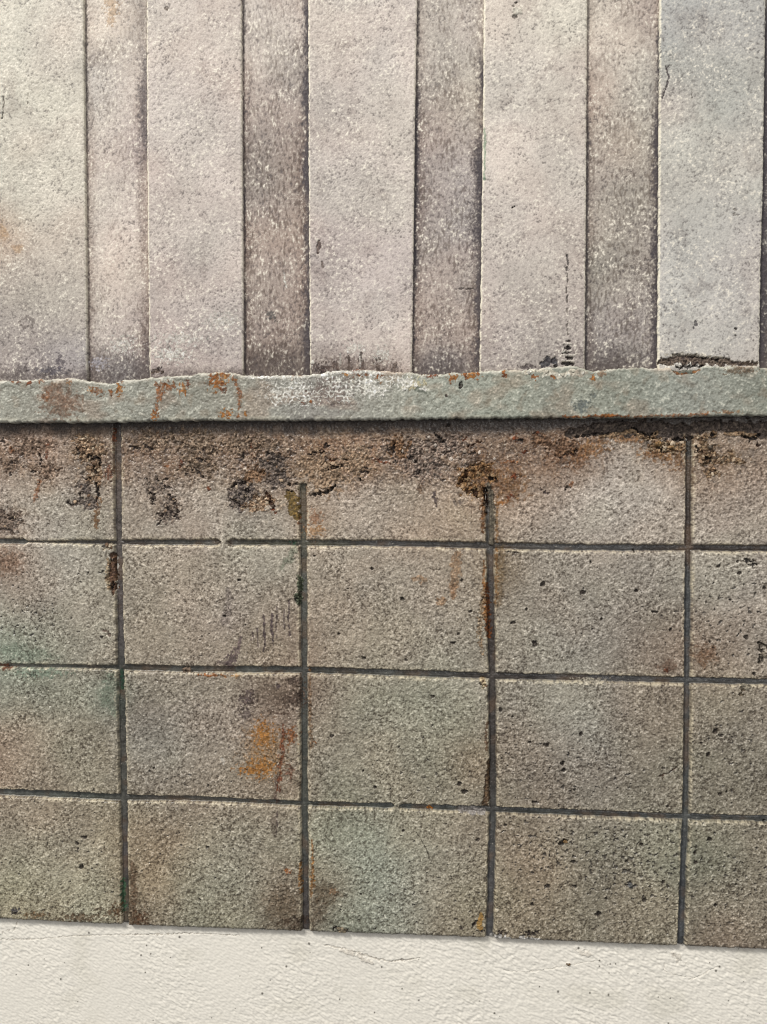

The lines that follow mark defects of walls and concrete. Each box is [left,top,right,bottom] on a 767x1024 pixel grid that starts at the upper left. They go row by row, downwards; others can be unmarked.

spalling [657,353,758,375]
corrosion [11,379,125,416]
corrosion [150,380,190,434]
corrosion [207,372,247,419]
corrosion [464,431,539,638]
corrosion [239,719,296,791]